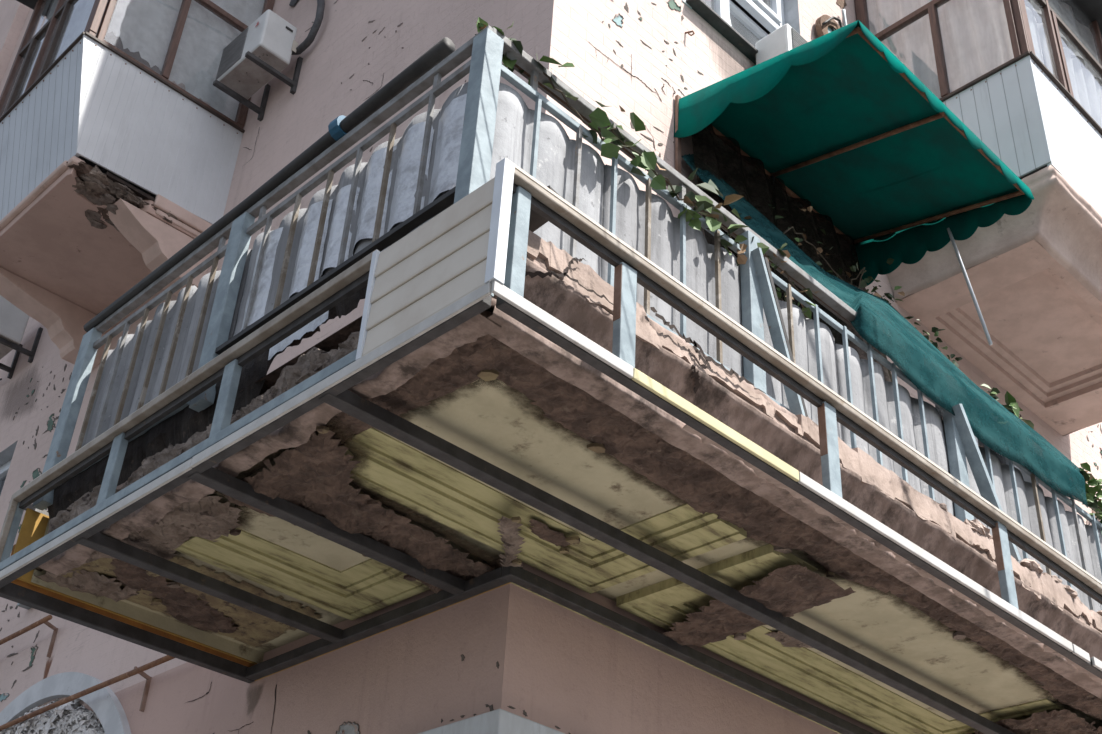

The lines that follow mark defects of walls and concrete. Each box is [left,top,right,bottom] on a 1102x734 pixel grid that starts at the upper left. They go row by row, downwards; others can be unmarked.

peeling [602,0,642,28]
peeling [651,0,684,20]
spalling [66,161,183,232]
spalling [527,230,614,315]
spalling [230,331,360,425]
spalling [636,302,820,449]
spalling [115,424,212,493]
spalling [33,551,296,647]
spalling [121,490,323,619]
spalling [236,411,580,594]
spalling [366,334,1102,734]
crack [233,685,277,733]